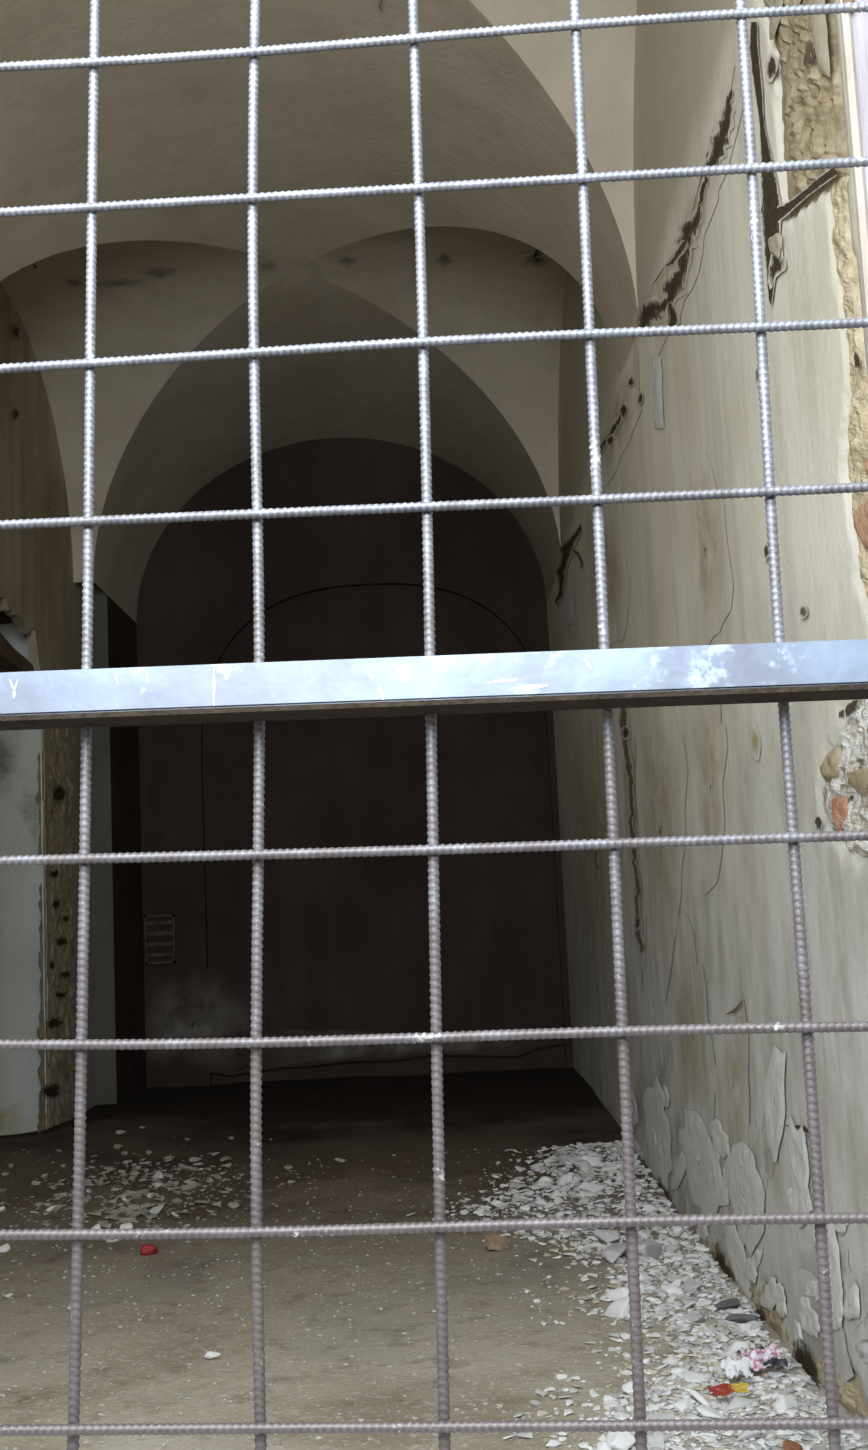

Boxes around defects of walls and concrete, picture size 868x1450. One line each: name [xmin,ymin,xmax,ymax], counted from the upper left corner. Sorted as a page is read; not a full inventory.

crack [634,22,837,328]
flaking render [763,0,868,598]
flaking render [815,699,868,856]
peeling [631,1045,868,1418]